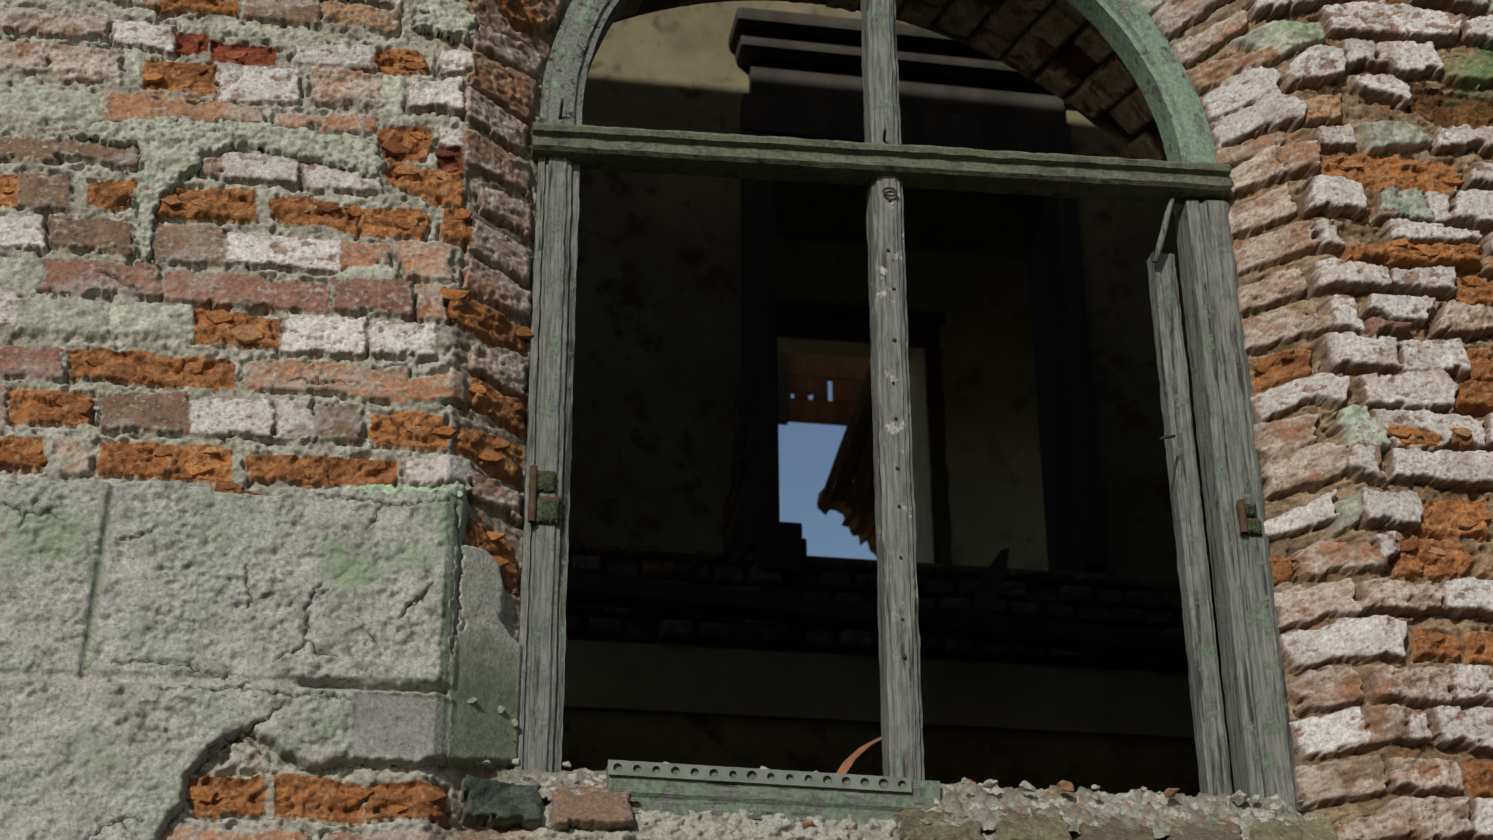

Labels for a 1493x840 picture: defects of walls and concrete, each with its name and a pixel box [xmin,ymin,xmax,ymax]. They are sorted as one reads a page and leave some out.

crack [321,494,465,653]
crack [114,583,351,775]
crack [89,816,145,836]